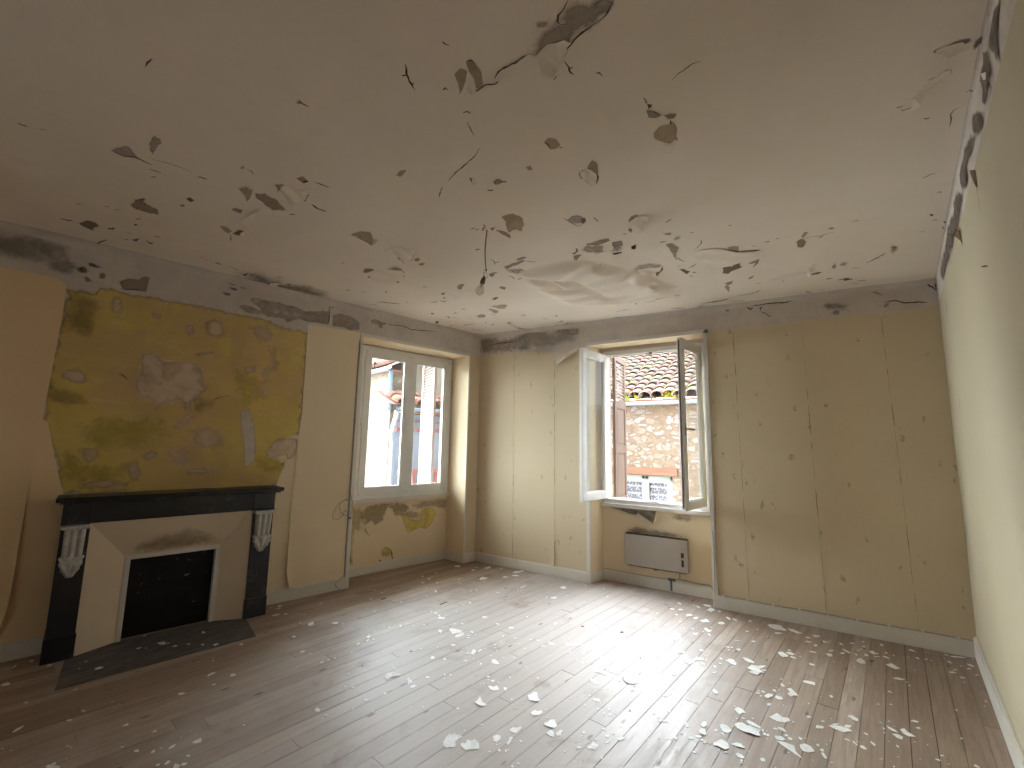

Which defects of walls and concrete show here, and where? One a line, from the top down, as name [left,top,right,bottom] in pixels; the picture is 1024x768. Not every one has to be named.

crack [402,64,415,89]
peeling [455,60,483,95]
peeling [531,40,574,80]
peeling [113,136,161,165]
crack [439,111,480,198]
peeling [643,98,677,152]
water stain [0,238,307,494]
peeling [241,409,256,467]